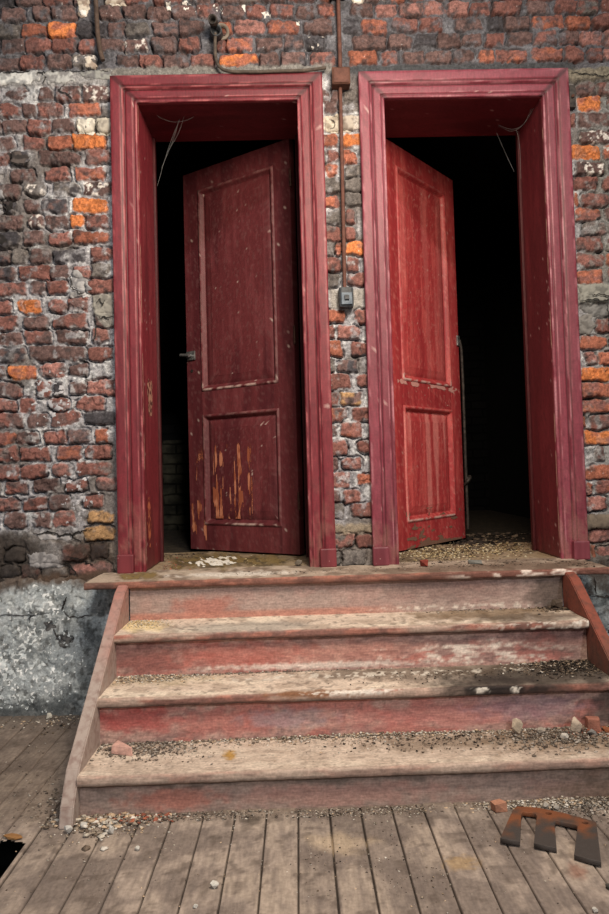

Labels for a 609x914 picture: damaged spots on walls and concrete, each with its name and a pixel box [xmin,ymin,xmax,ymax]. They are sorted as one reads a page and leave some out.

peeling [197,443,253,519]
peeling [192,500,207,540]
crack [32,529,93,576]
crack [4,597,89,640]